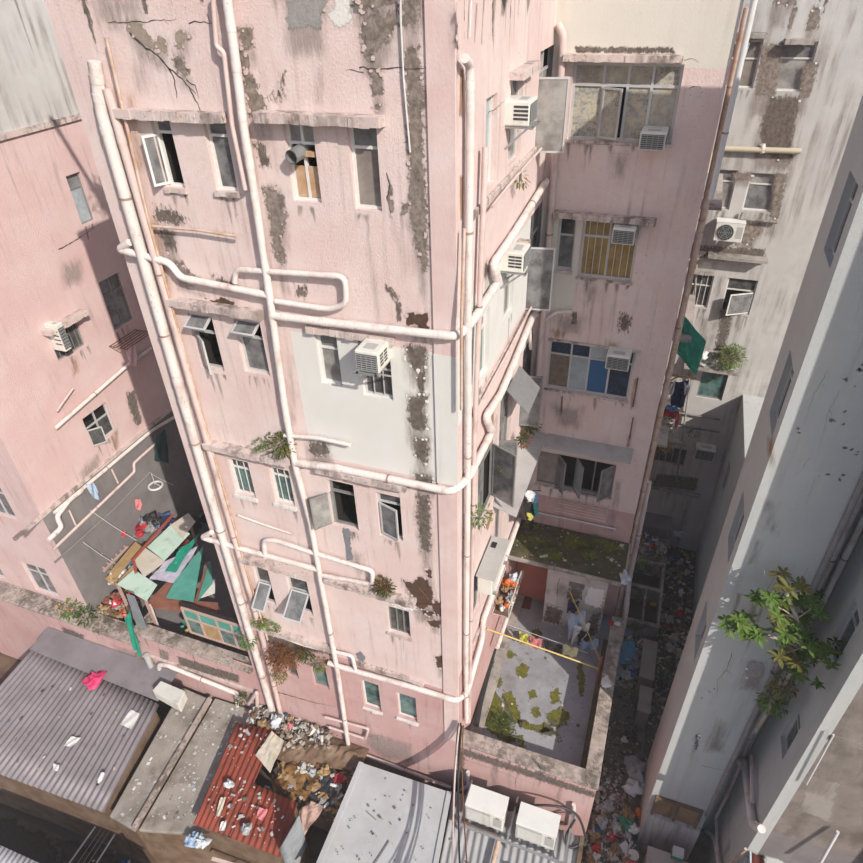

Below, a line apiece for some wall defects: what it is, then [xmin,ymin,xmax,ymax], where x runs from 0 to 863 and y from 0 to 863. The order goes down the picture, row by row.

peeling [285,0,328,49]
crack [108,15,211,111]
water stain [153,207,186,225]
water stain [617,311,633,333]
water stain [126,391,141,425]